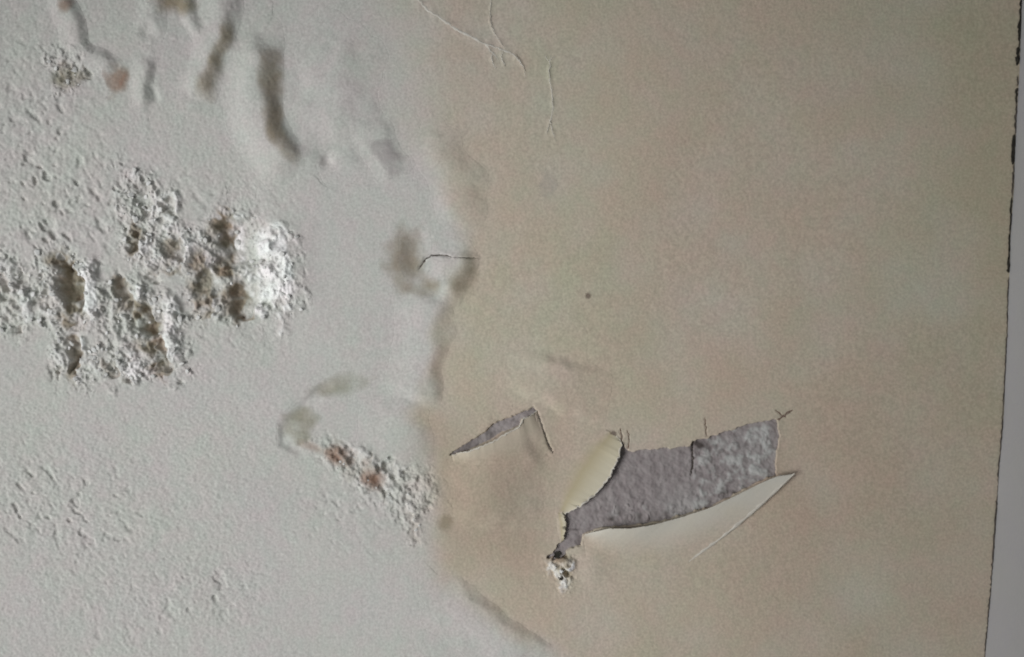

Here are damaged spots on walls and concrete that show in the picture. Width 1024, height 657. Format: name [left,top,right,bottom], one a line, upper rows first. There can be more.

crack [418,0,525,75]
flaking render [0,152,313,398]
crack [418,254,478,270]
flaking render [298,430,454,548]
peeling [540,419,795,599]